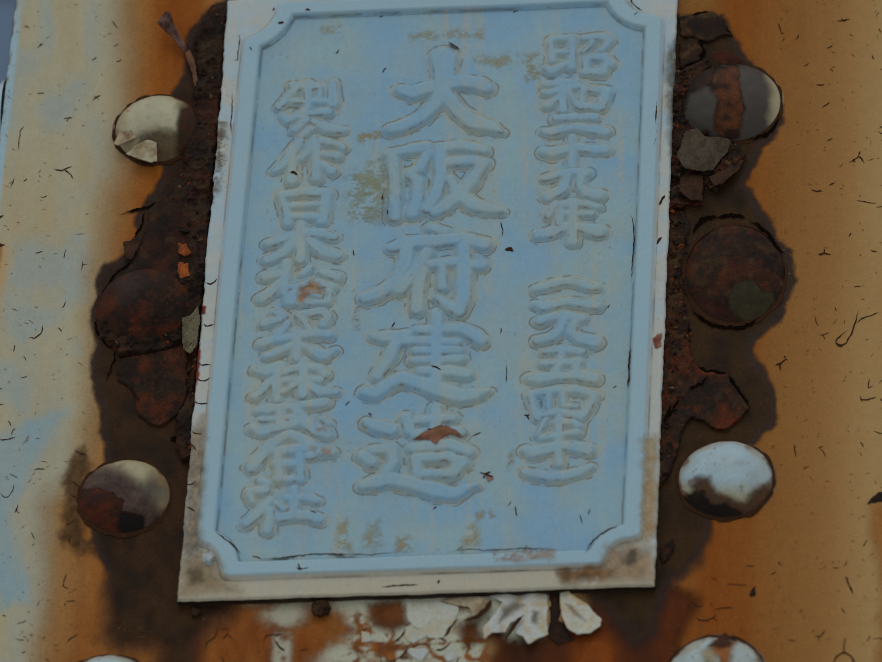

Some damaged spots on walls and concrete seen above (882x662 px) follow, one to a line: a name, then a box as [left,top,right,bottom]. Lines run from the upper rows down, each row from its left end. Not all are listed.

corrosion [39,0,446,662]
corrosion [457,0,813,662]
peeling [867,491,882,504]
peeling [396,593,548,662]
peeling [560,591,601,635]